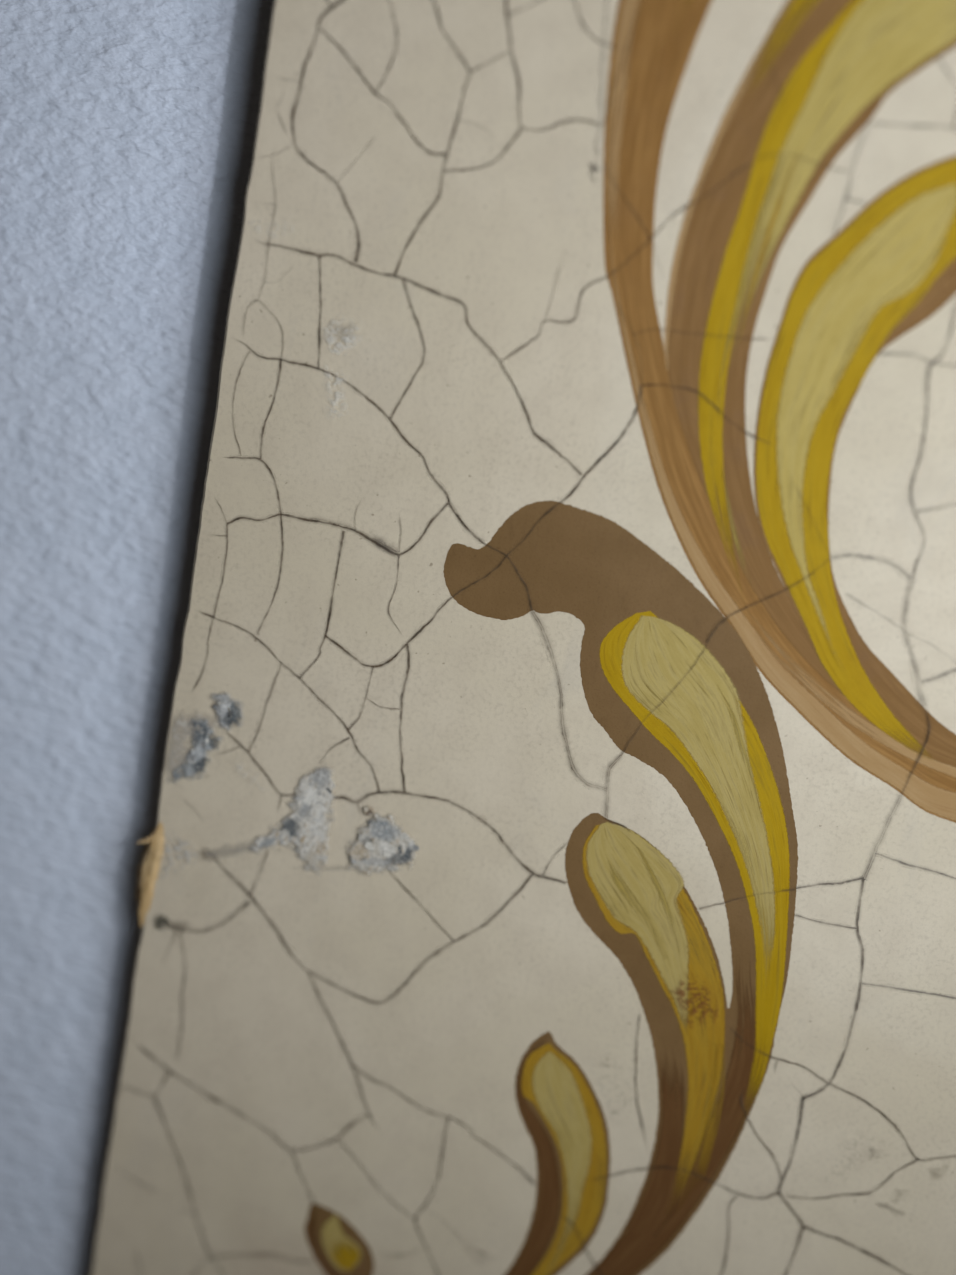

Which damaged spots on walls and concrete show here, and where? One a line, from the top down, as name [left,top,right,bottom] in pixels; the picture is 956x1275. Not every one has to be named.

crack [203,0,653,1004]
crack [910,422,927,517]
spalling [169,694,242,782]
crack [917,699,930,762]
spalling [136,822,165,927]
spalling [348,813,419,874]
crack [796,858,908,1011]
crack [635,1017,644,1129]
crack [335,1029,492,1275]
crack [716,1053,925,1275]